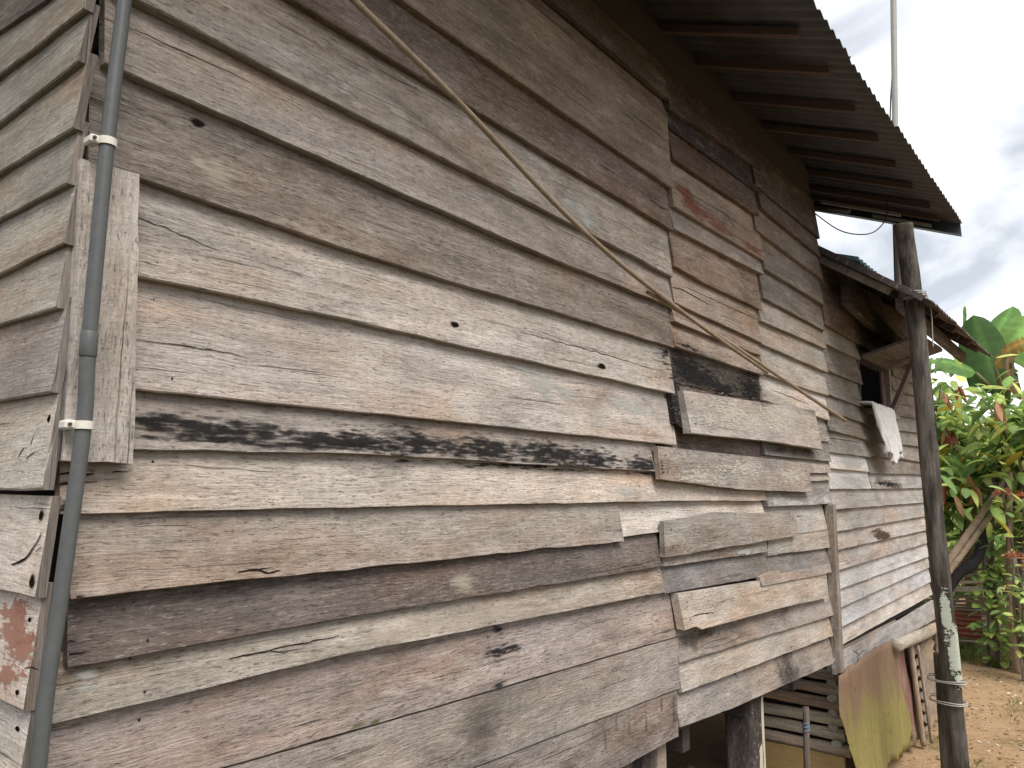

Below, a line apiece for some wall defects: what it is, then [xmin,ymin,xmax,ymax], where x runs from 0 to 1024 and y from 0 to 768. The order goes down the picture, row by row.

leakage [660,344,768,405]
leakage [135,412,665,474]
crack [12,532,42,565]
crack [238,566,281,574]
peeling [0,595,38,690]
crack [229,635,339,659]